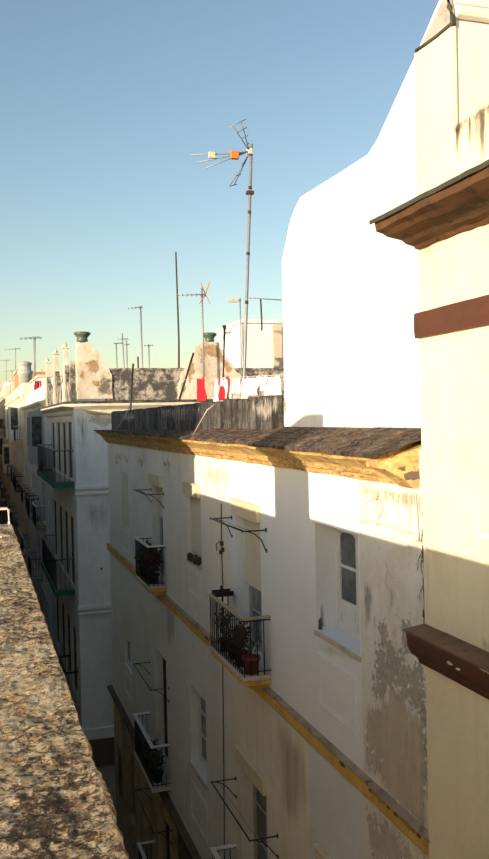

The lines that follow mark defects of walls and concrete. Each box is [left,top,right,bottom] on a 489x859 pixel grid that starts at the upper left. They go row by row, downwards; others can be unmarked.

water stain [456,111,484,145]
spalling [80,360,100,386]
crack [417,534,425,624]
peeling [371,616,428,799]